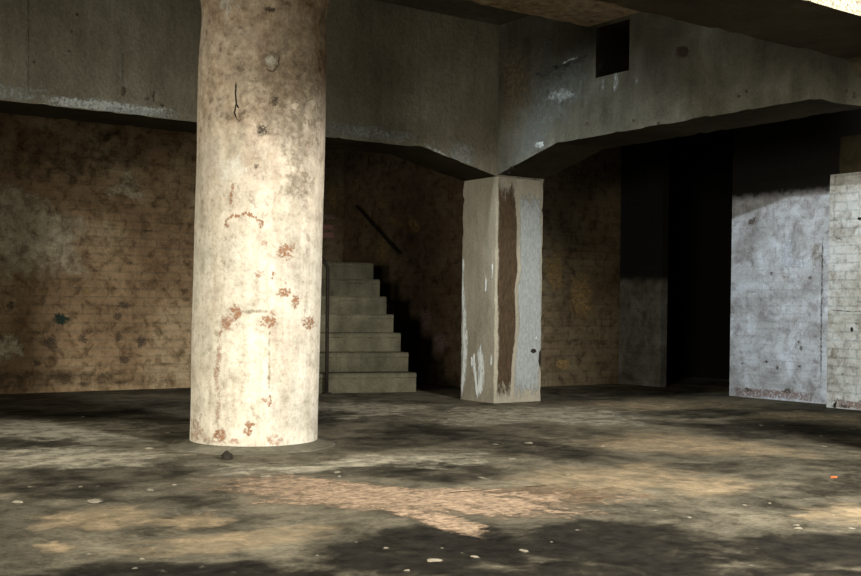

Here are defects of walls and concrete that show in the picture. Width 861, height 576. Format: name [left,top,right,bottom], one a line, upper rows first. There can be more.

crack [232,84,240,119]
corrosion [224,183,264,228]